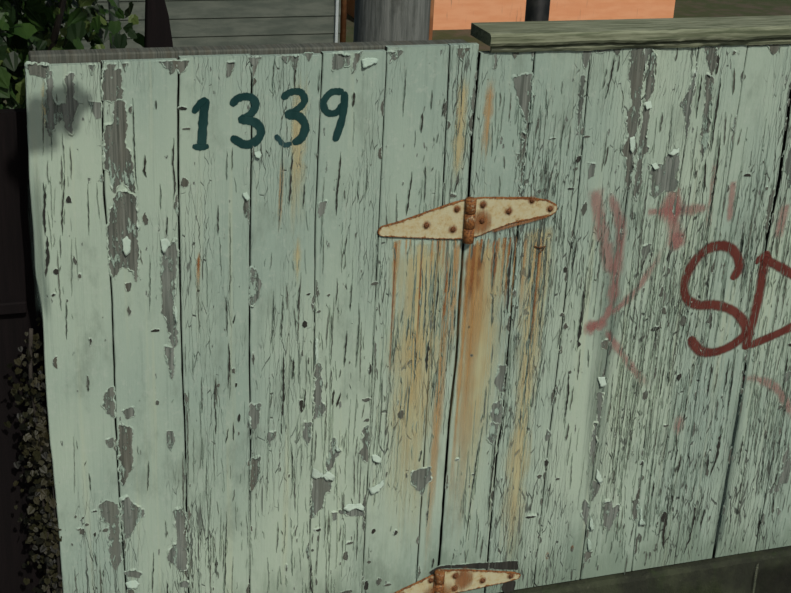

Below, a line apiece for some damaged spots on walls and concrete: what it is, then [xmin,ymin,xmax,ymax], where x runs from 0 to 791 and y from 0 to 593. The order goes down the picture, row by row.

peeling [24,61,149,292]
peeling [511,72,534,192]
peeling [573,48,680,202]
peeling [679,46,718,163]
peeling [150,237,180,380]
corrosion [390,197,550,502]
peeling [74,386,146,593]
peeling [166,506,190,588]
peeling [308,437,366,532]
peeling [410,466,433,496]
corrosion [428,570,486,593]